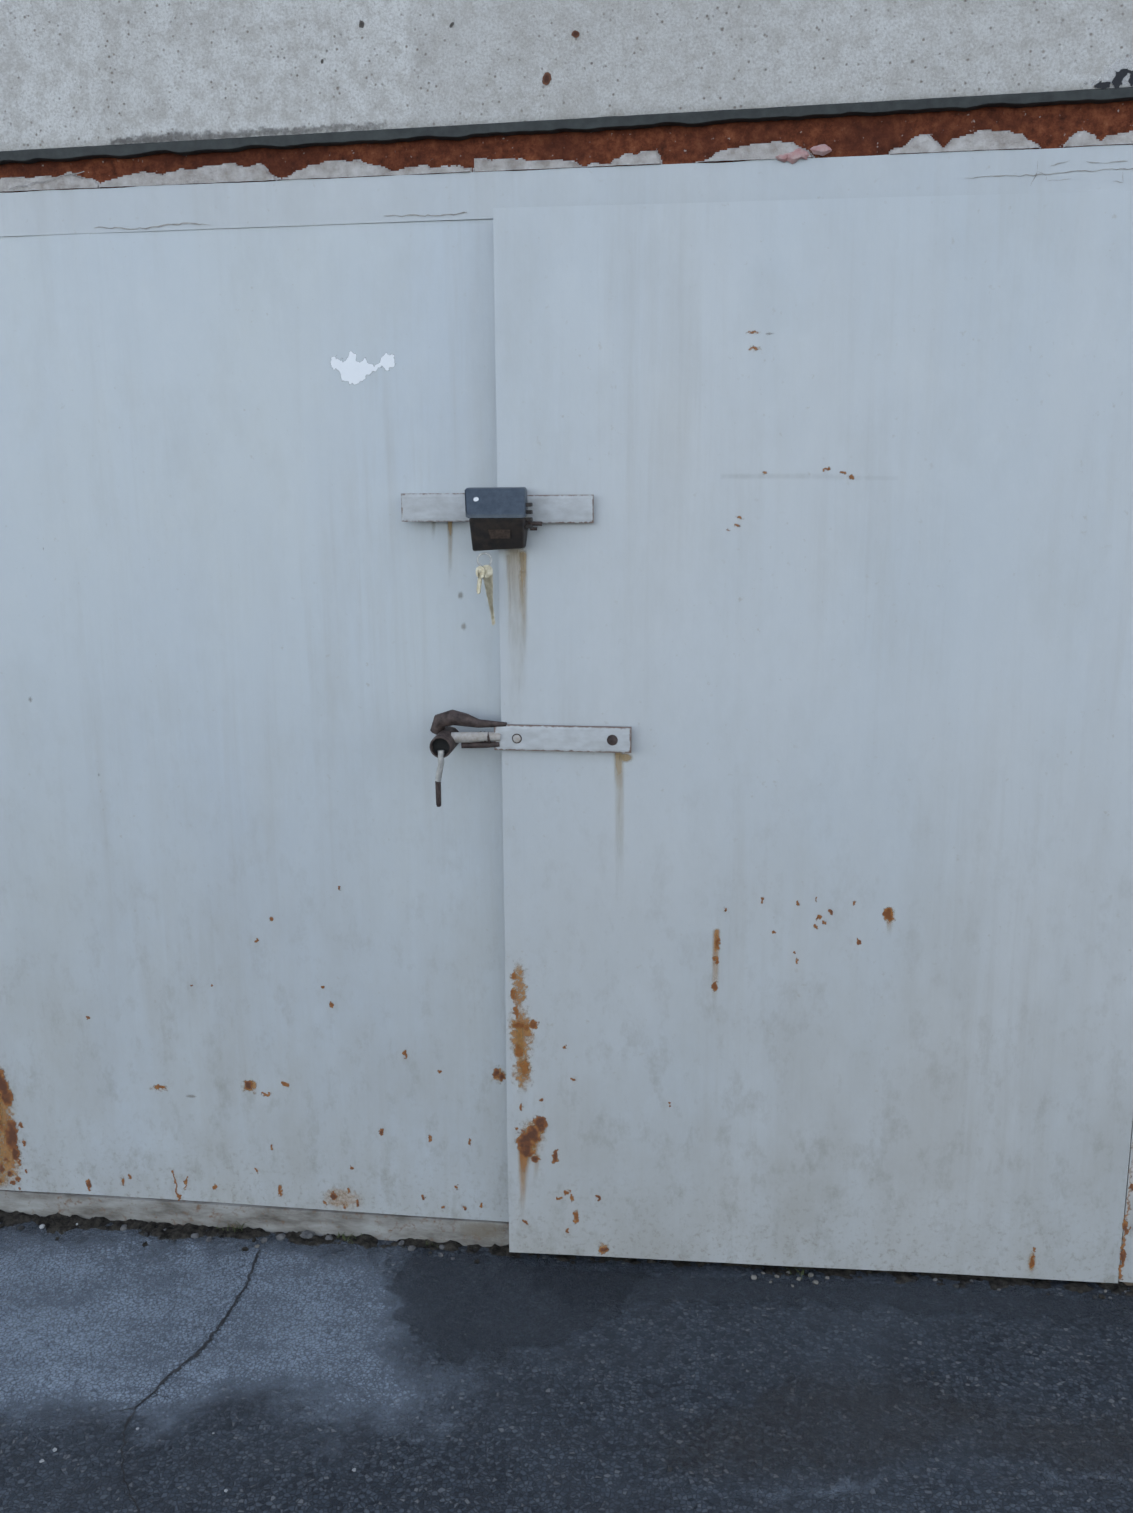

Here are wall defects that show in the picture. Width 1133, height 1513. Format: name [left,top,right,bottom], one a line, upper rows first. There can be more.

rust [712,929,721,964]
rust [882,907,894,922]
rust [0,1070,27,1190]
rust [492,968,559,1182]
rust [1118,1184,1133,1280]
crack [97,1249,260,1513]